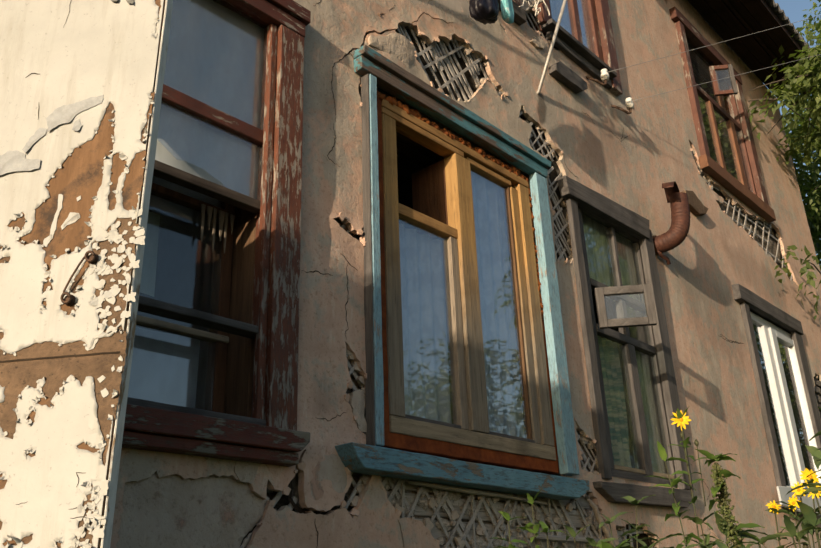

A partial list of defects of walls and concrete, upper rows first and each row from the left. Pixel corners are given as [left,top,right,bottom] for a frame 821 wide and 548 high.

crack [327,5,408,164]
spalling [368,24,508,102]
spalling [519,111,573,263]
spalling [690,148,793,281]
peeling [0,92,155,466]
crack [302,253,358,339]
peeling [0,471,10,489]
peeling [0,521,33,548]
spalling [116,461,298,548]
crack [288,479,348,546]
spalling [338,467,606,548]
spalling [616,520,654,548]